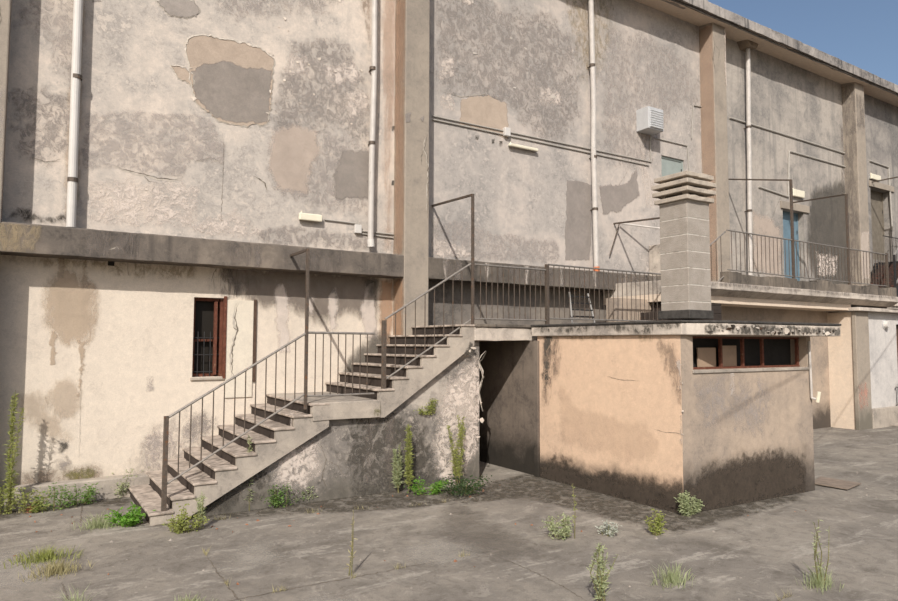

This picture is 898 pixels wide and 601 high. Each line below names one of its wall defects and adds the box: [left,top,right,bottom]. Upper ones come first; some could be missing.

flaking render [156,0,201,20]
flaking render [170,34,276,128]
water stain [196,212,367,248]
water stain [47,260,96,397]
crack [229,305,239,376]
water stain [222,249,377,352]
water stain [540,451,807,515]